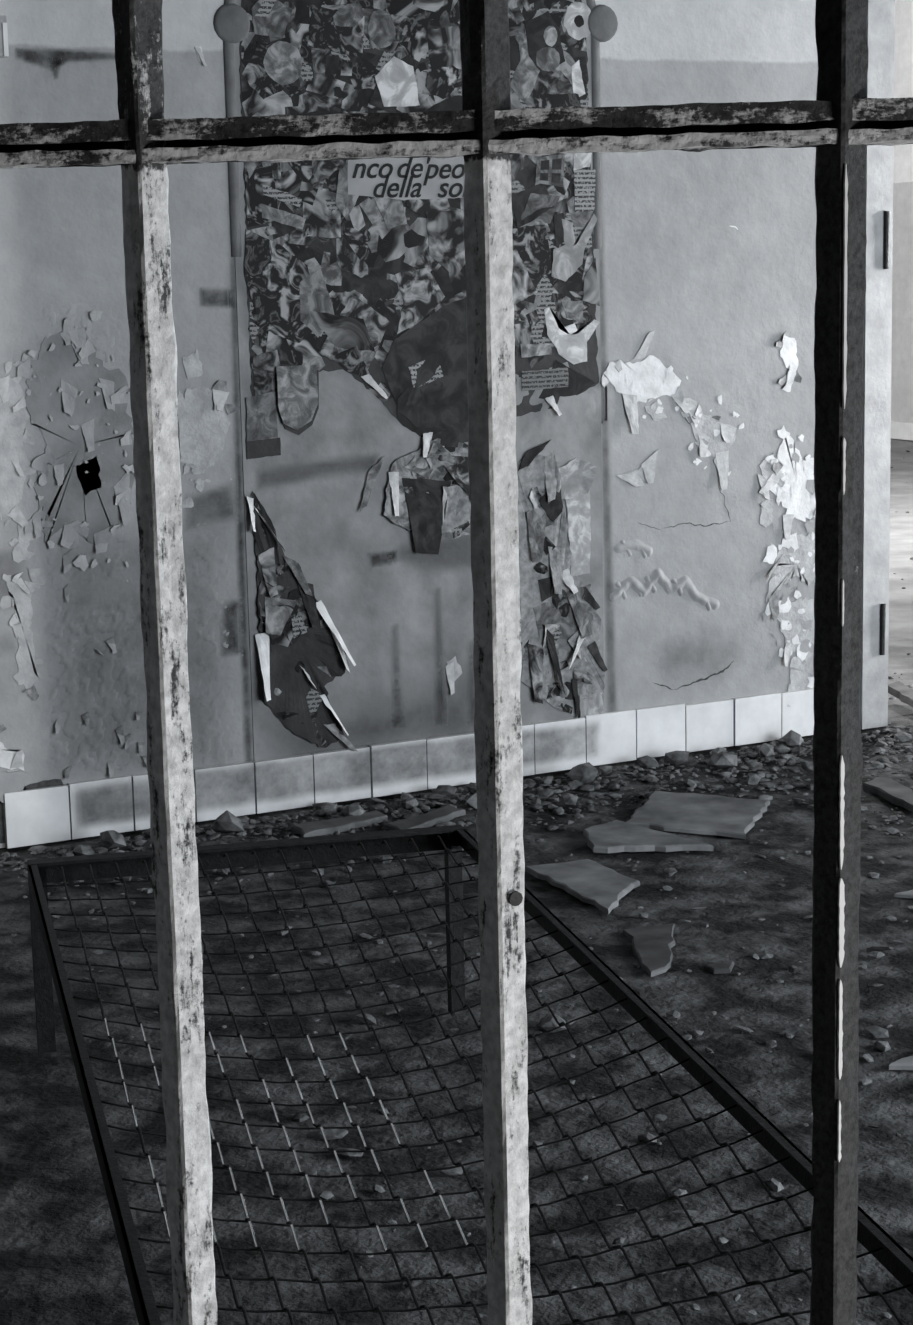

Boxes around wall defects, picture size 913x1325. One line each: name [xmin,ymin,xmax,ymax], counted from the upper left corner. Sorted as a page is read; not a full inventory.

peeling [0,311,135,701]
peeling [177,350,240,508]
flaking render [0,724,64,844]